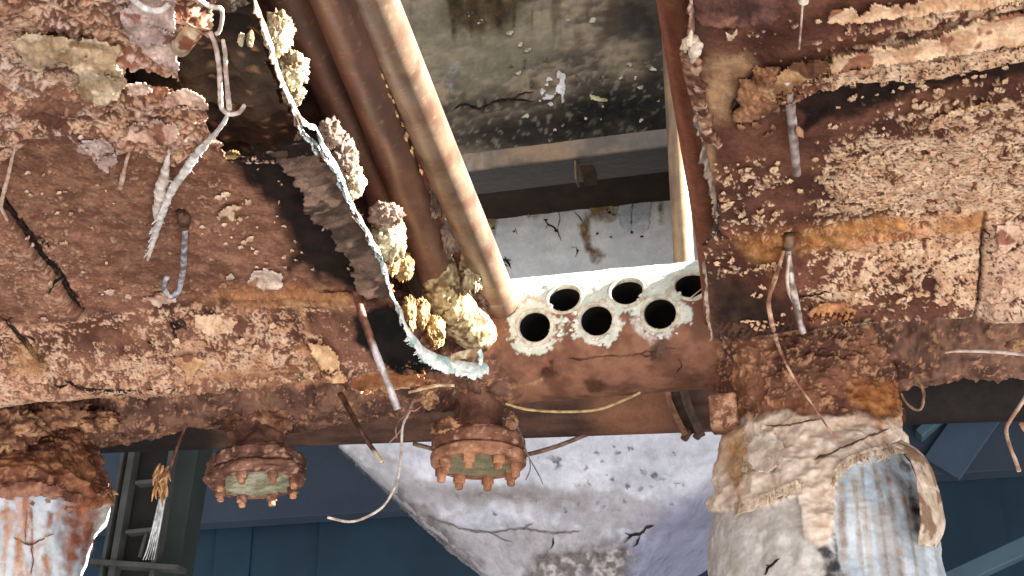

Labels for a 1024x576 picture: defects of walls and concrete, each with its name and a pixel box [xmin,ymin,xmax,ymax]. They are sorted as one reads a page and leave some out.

leakage [449,0,515,32]
crack [453,92,533,111]
peeling [836,69,959,134]
peeling [960,64,1009,93]
peeling [714,159,805,223]
crack [3,201,84,310]
peeling [713,256,777,277]
crack [4,318,176,394]
rust [585,381,604,392]
rust [4,498,33,576]
rust [48,498,99,573]
crack [427,516,580,555]